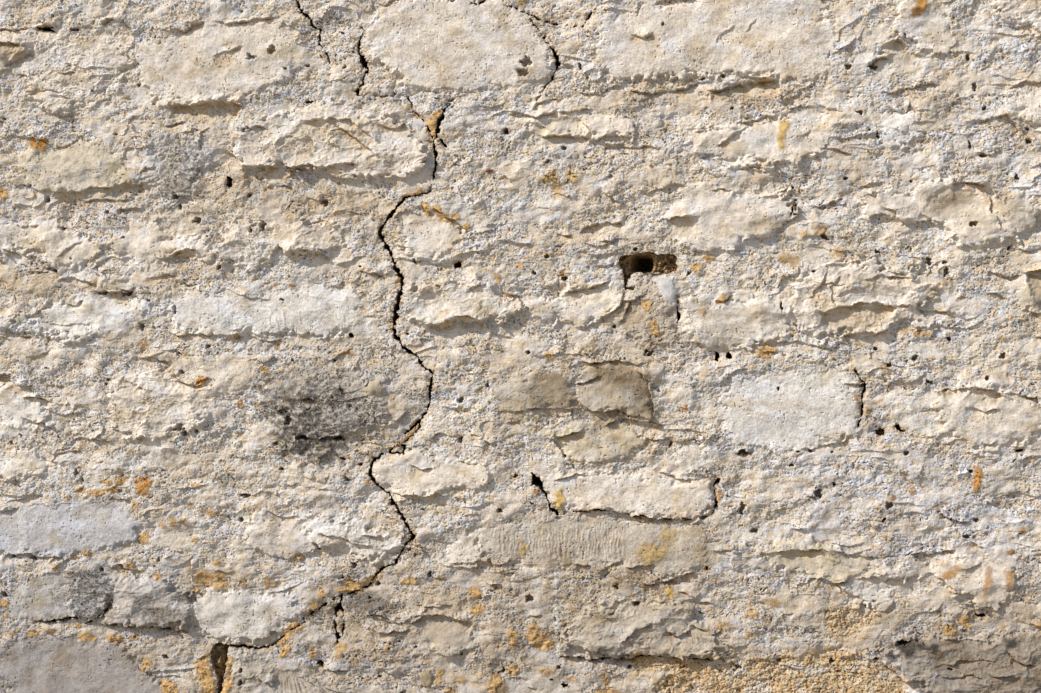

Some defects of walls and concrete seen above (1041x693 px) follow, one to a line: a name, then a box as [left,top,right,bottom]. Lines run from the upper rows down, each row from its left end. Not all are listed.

crack [296,0,330,70]
crack [450,0,603,101]
crack [230,26,454,650]
crack [531,472,719,521]